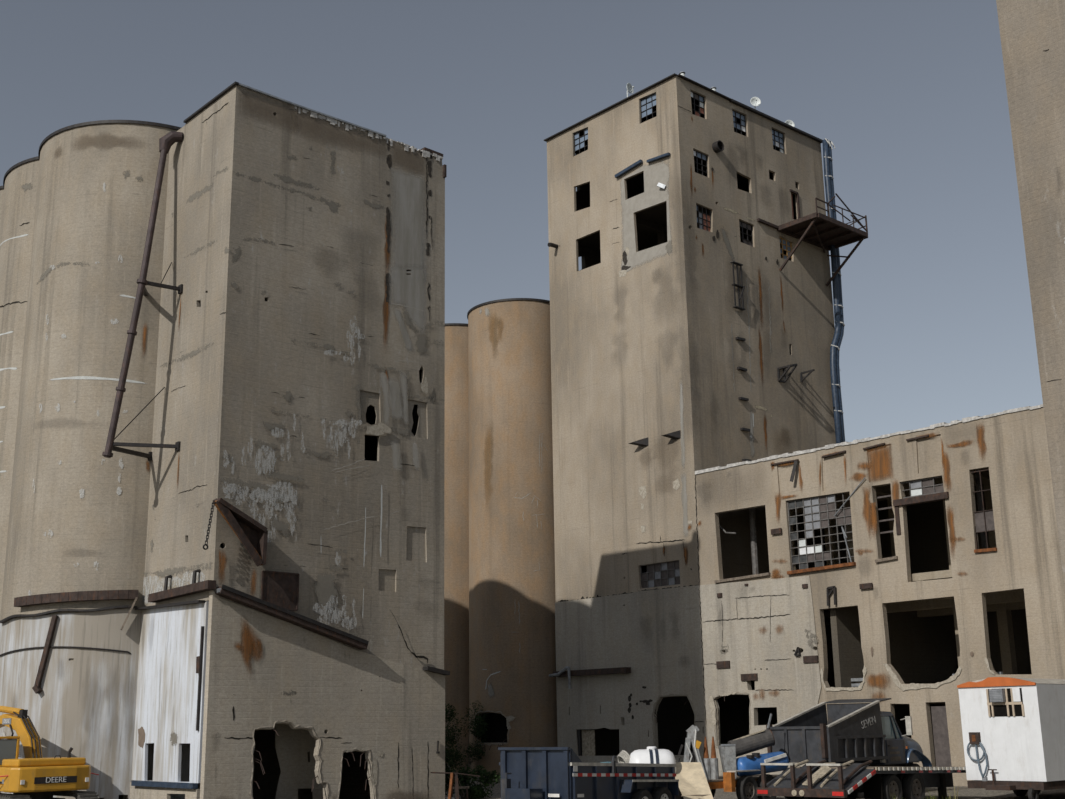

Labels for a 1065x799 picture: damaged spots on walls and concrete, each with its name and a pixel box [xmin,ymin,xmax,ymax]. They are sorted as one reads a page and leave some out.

corrosion [771,462,803,519]
corrosion [819,445,899,531]
corrosion [235,624,262,670]
crack [390,610,428,663]
spalling [249,720,384,799]